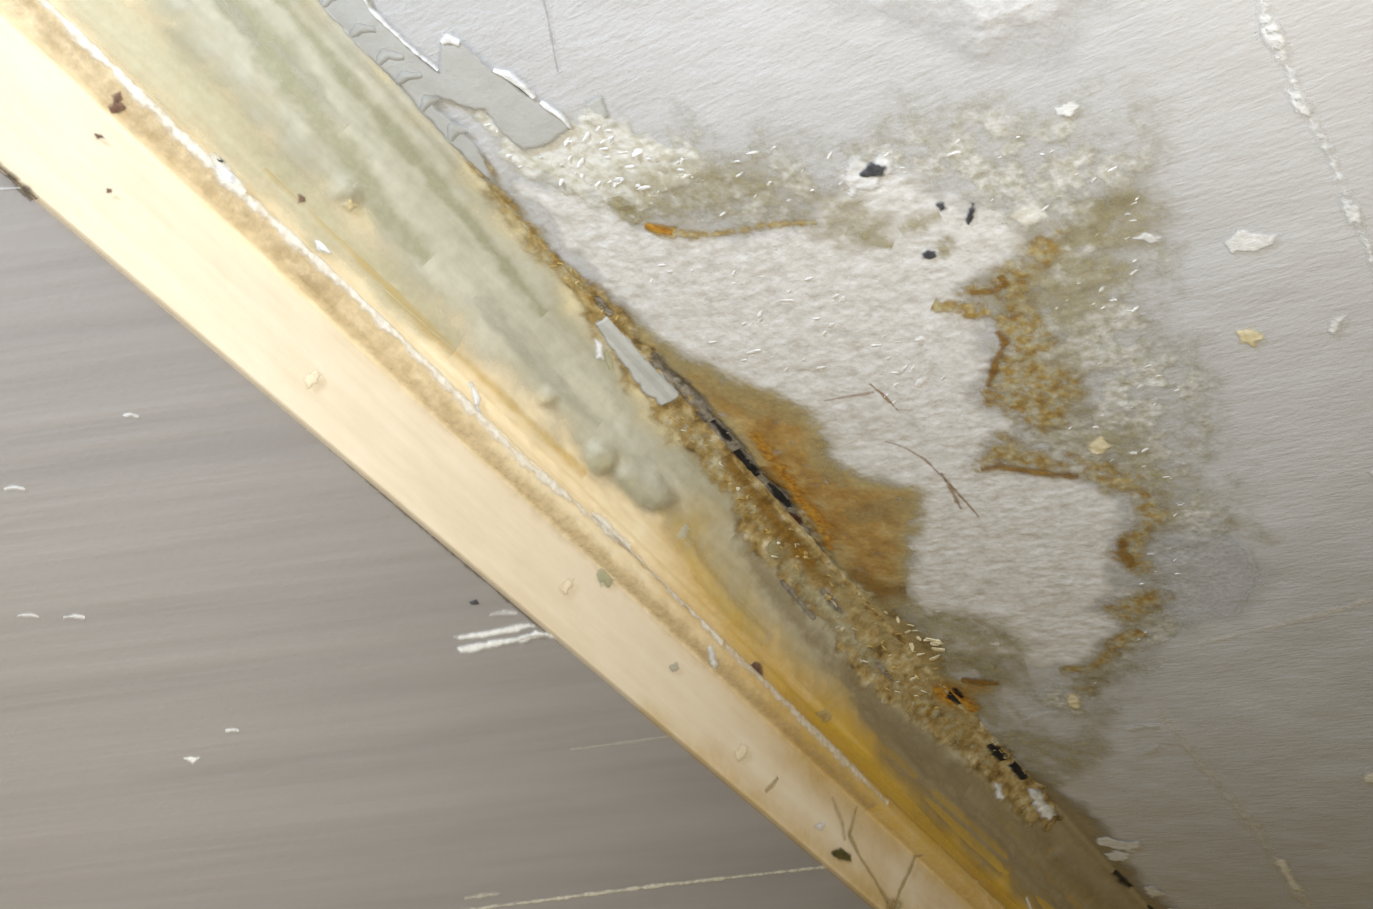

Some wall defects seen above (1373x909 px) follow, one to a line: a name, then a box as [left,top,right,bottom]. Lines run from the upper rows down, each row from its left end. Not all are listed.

crack [1258,0,1373,265]
peeling [39,0,867,782]
crack [593,296,613,316]
damp [70,0,1168,909]
crack [650,352,836,565]
spalling [320,0,1234,831]
damp [1149,533,1261,620]